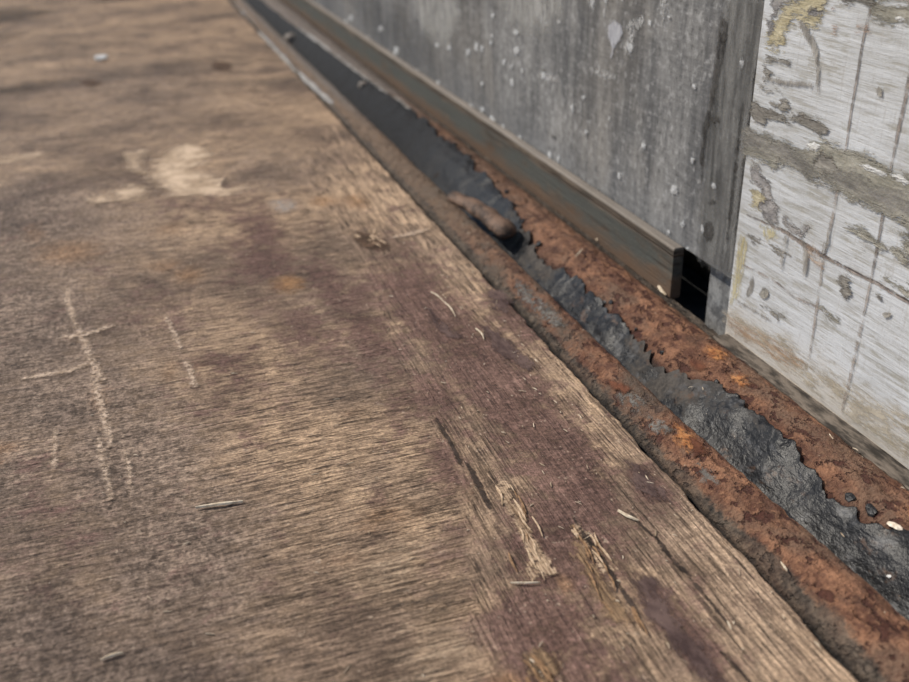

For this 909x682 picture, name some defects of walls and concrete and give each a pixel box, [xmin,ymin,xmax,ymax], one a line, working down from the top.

peeling [245,0,909,635]
rust [674,426,706,457]